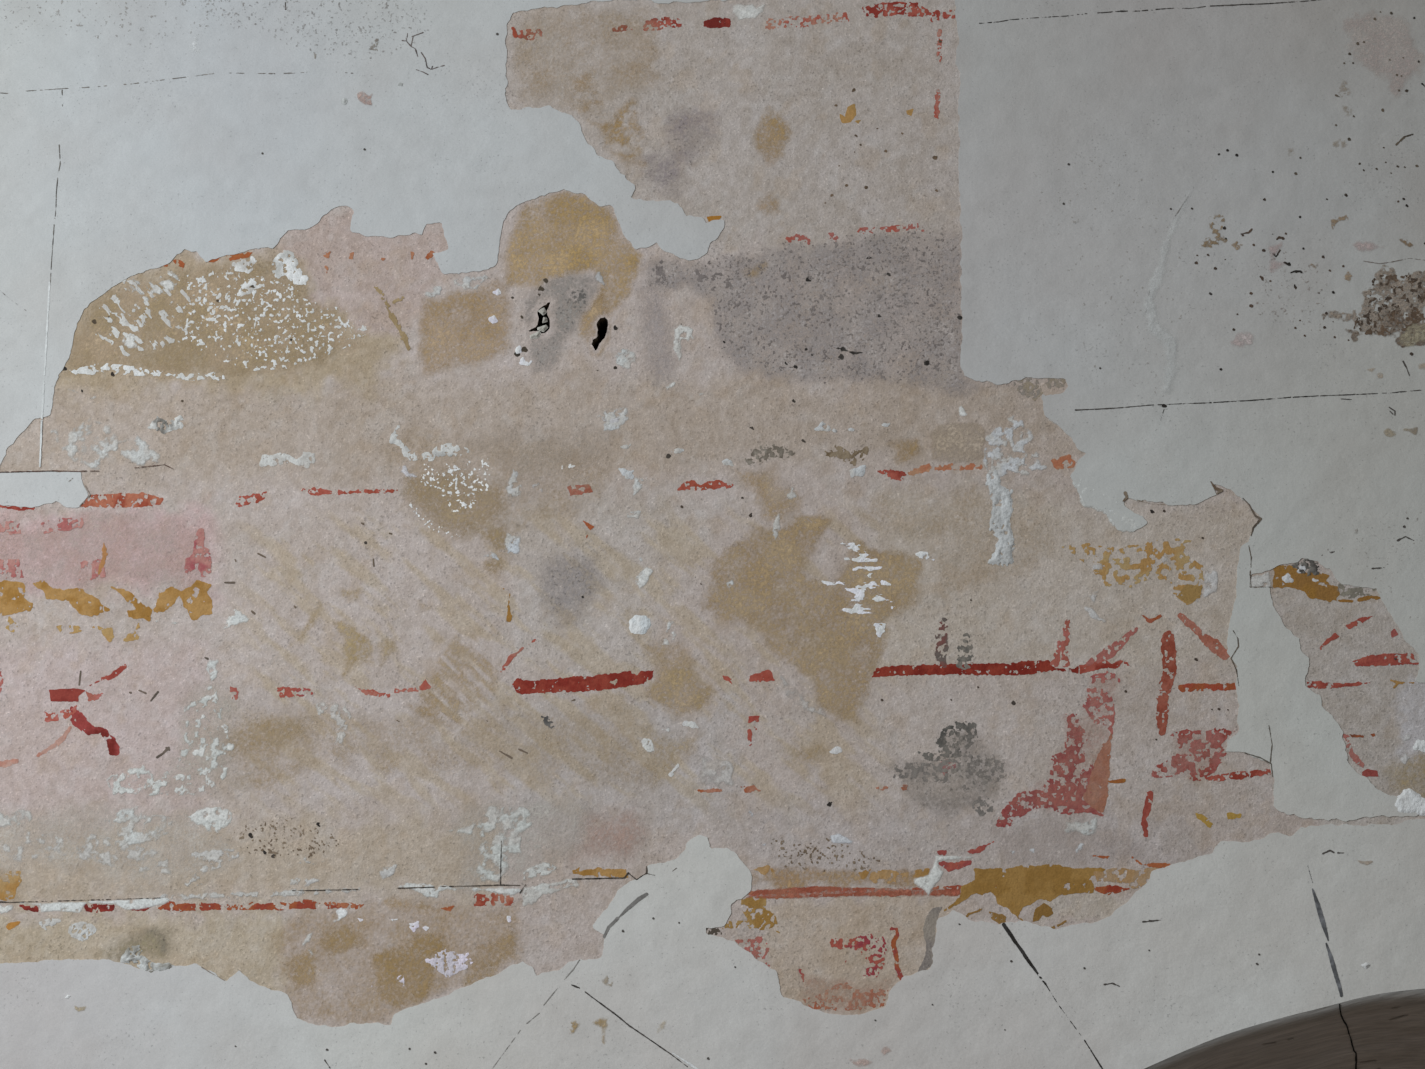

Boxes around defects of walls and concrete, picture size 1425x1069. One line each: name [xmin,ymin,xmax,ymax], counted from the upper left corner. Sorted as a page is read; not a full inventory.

peeling [212,326,246,363]
peeling [838,602,889,622]
peeling [1250,558,1425,798]
crack [292,886,358,894]
crack [398,841,526,893]
crack [493,866,698,1069]
crack [1002,923,1103,1069]
crack [1309,871,1357,1069]